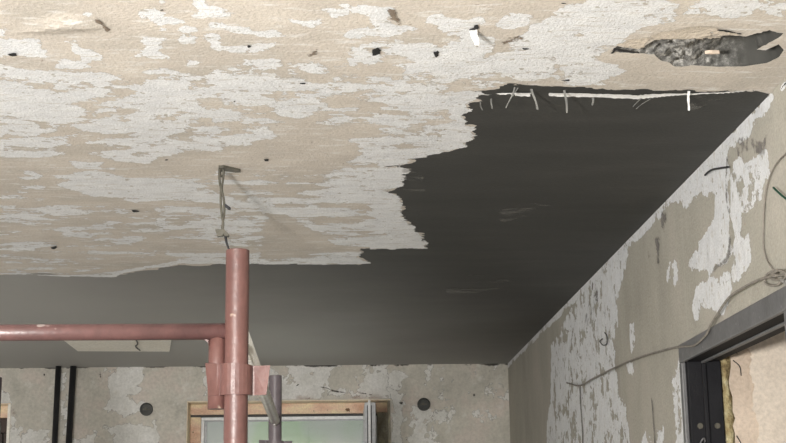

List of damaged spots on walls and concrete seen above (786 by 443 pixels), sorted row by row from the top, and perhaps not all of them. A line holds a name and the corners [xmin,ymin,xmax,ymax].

peeling [0,0,786,277]
peeling [493,93,774,443]
peeling [1,390,52,443]
peeling [60,367,160,443]
peeling [268,364,456,443]